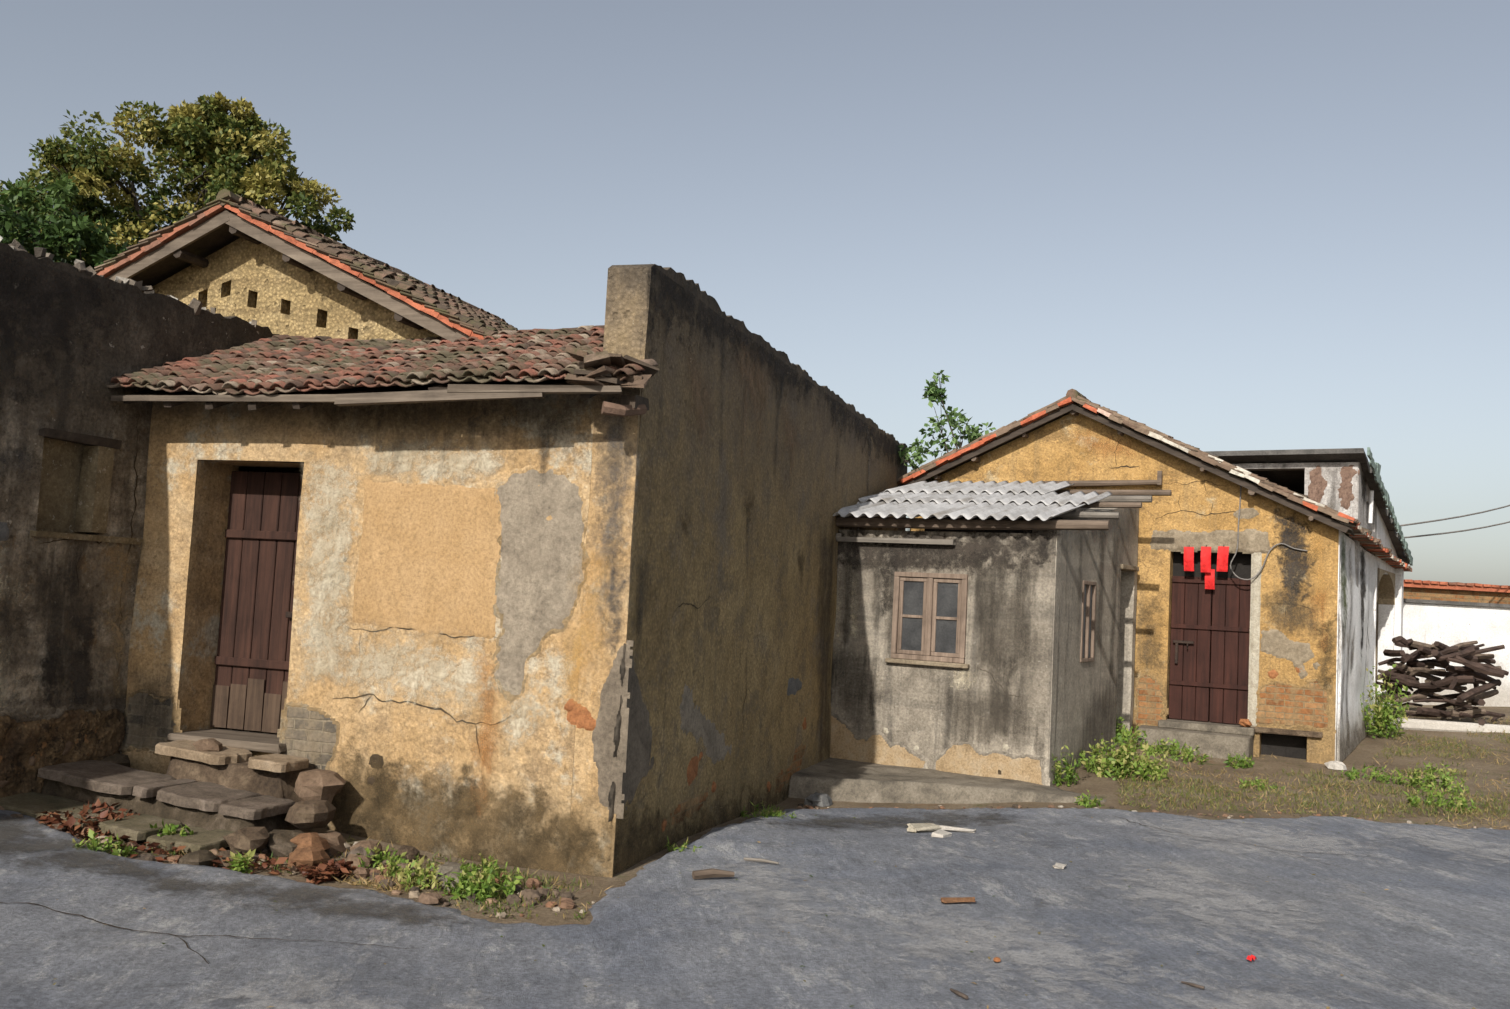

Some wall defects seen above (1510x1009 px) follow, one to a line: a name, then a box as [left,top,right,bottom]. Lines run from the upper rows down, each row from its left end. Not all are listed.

spalling [1308,465,1360,510]
water stain [40,545,137,707]
crack [333,693,521,758]
peeling [502,686,540,745]
spalling [564,699,596,731]
flaking render [830,712,1050,786]
water stain [820,508,1137,769]
spalling [1256,629,1336,733]
water stain [1266,509,1370,762]
water stain [331,743,1011,877]